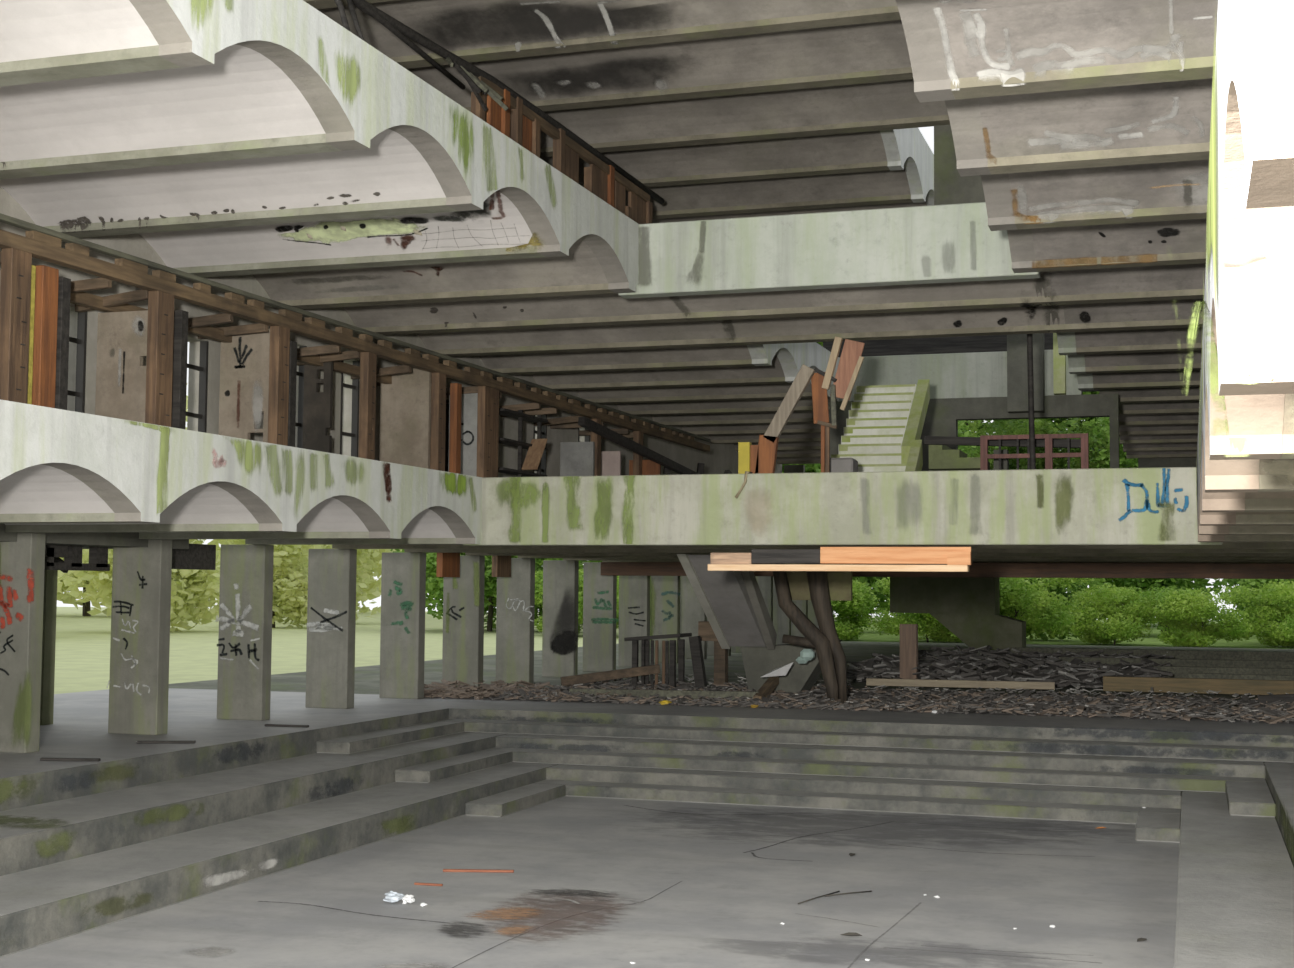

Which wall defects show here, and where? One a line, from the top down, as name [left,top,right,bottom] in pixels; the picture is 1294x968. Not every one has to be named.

leakage [520,1,565,48]
leakage [597,1,618,44]
spalling [275,200,489,246]
leakage [510,477,521,542]
leakage [564,476,580,529]
leakage [623,475,634,544]
leakage [550,631,578,655]